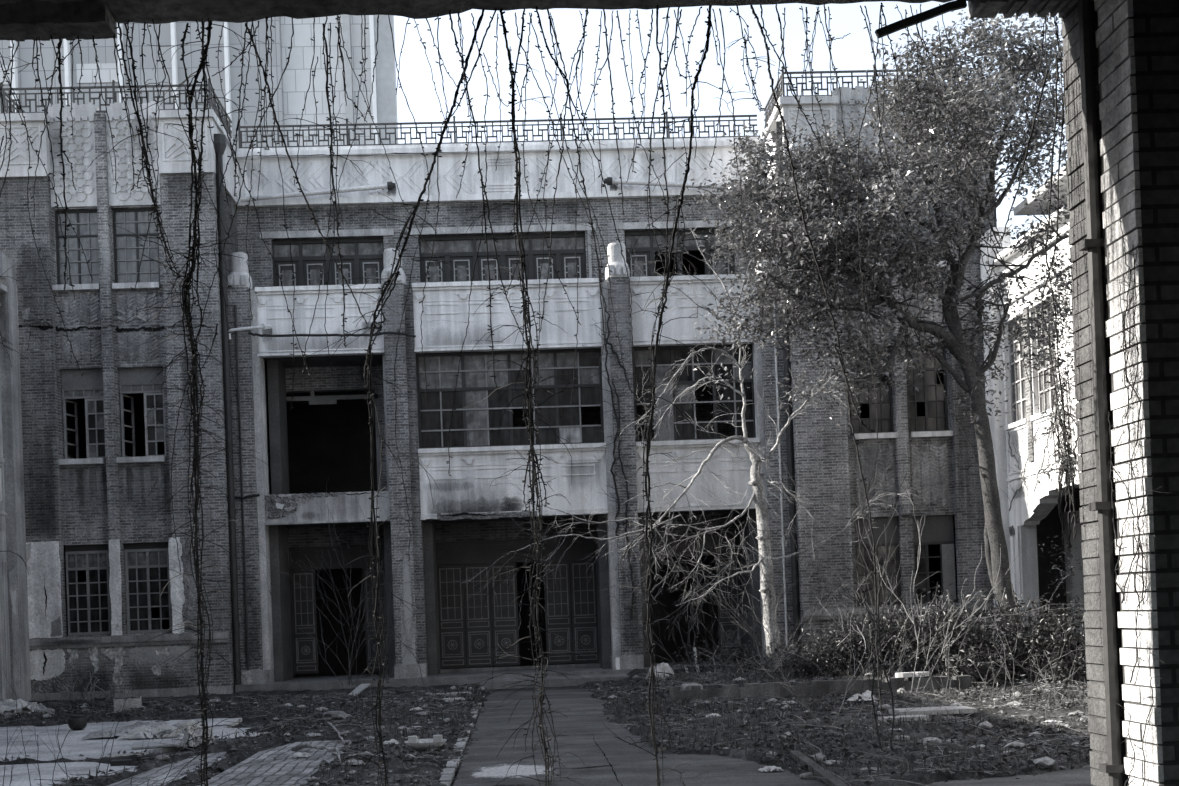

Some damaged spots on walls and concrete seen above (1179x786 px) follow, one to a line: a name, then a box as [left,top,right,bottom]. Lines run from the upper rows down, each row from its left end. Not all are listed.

crack [18,325,211,351]
leakage [447,498,520,514]
flaking render [26,539,125,694]